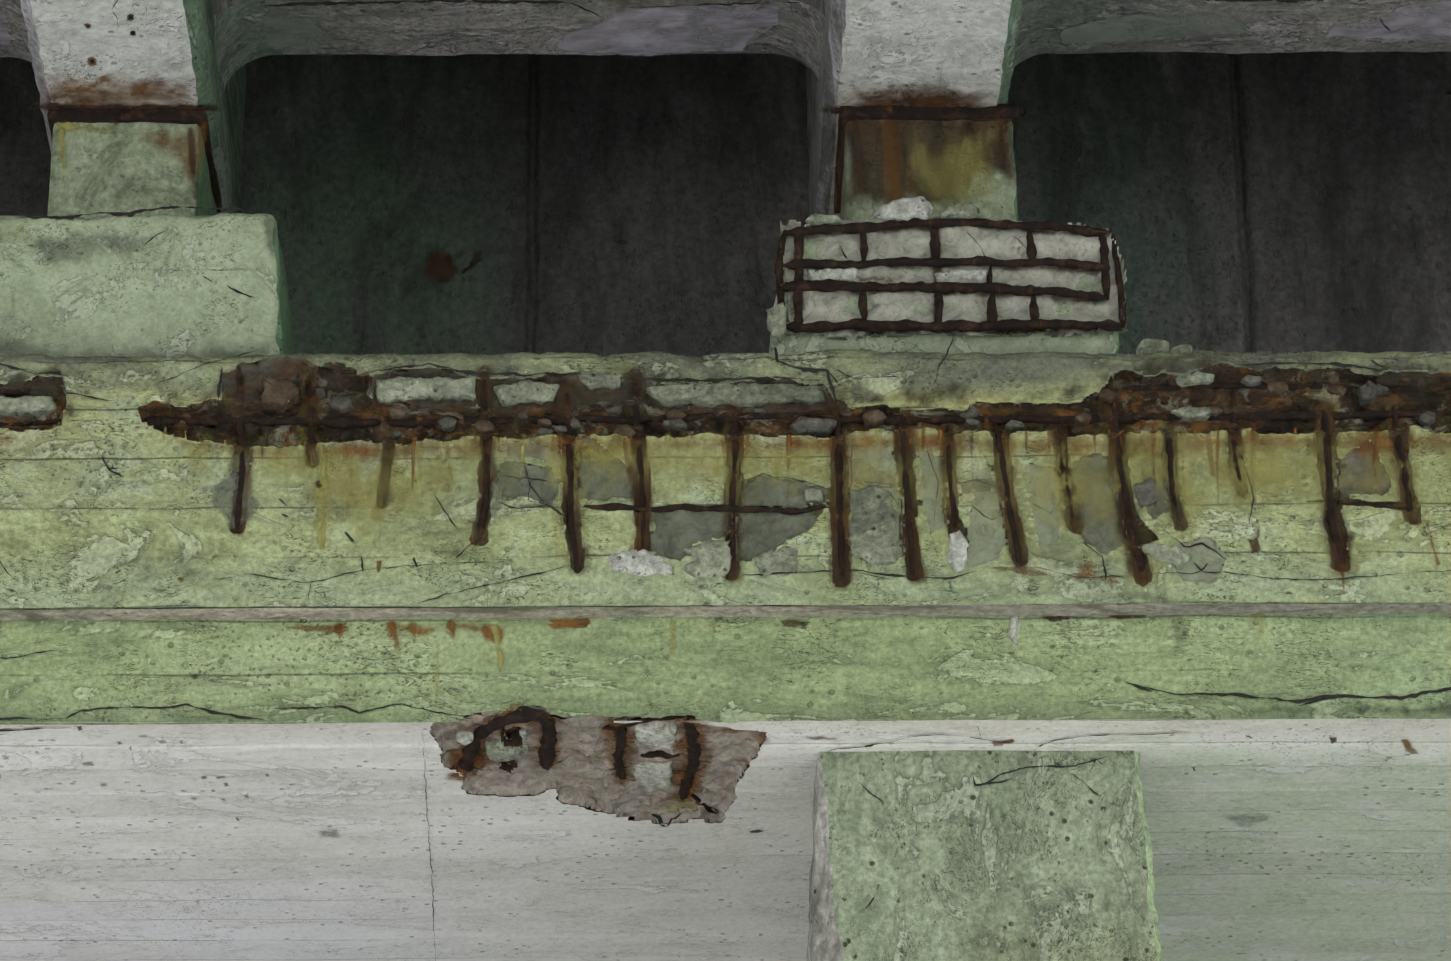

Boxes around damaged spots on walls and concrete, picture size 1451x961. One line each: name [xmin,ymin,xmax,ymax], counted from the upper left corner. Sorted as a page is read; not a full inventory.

rust [29,57,219,164]
rust [822,85,1024,204]
spalling [0,370,73,432]
spalling [138,355,1451,587]
rust [1250,533,1260,553]
crack [1126,682,1451,711]
spalling [429,706,767,827]
crack [815,727,1202,802]
crack [0,703,472,959]